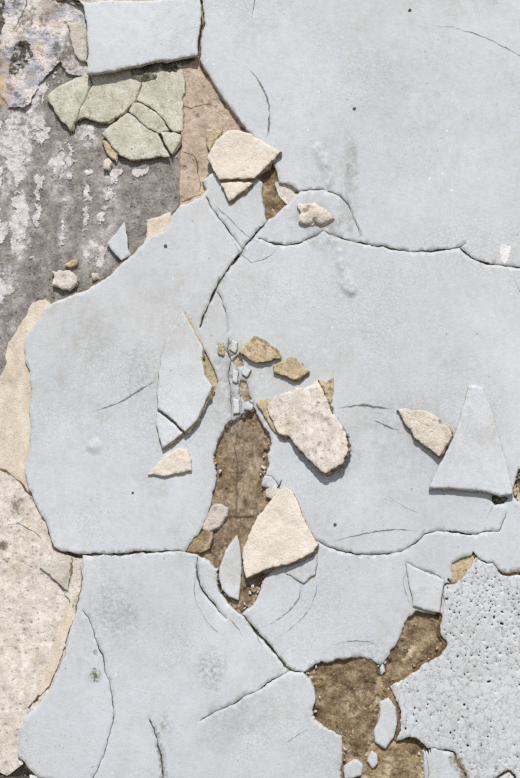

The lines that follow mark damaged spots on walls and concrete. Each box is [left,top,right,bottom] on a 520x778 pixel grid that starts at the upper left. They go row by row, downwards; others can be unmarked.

spalling [0,0,298,376]
crack [181,152,517,327]
crack [0,468,33,500]
peeling [0,470,83,775]
crack [9,517,300,721]
peeling [148,311,218,478]
peeling [186,336,351,614]
peeling [305,555,520,778]
crack [317,505,520,576]
crack [375,581,467,778]
peeling [397,385,520,505]
crack [496,770,516,778]